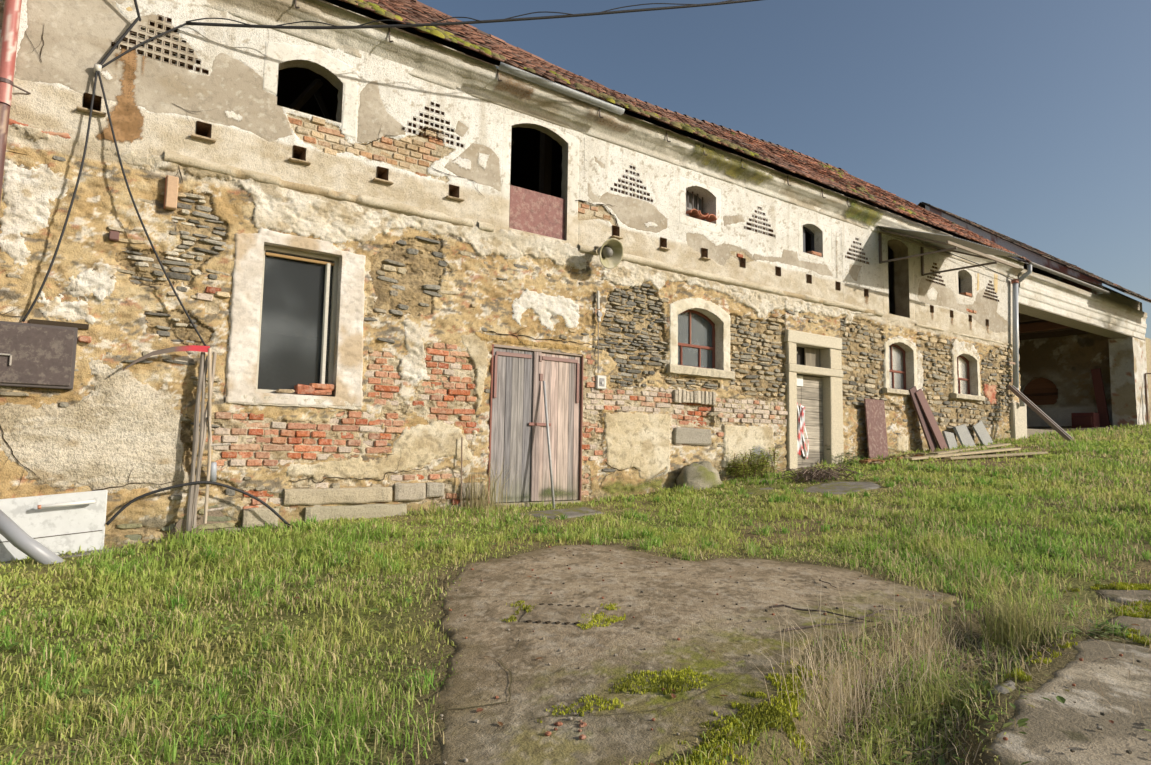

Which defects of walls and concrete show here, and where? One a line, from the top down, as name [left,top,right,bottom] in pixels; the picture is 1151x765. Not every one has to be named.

peeling [9,0,501,198]
flaking render [0,159,76,271]
flaking render [108,148,587,270]
peeling [578,183,667,248]
peeling [723,215,745,226]
flaking render [37,262,118,325]
flaking render [196,285,221,314]
flaking render [600,261,876,325]
spalling [686,232,869,297]
flaking render [205,320,489,510]
crack [0,425,37,490]